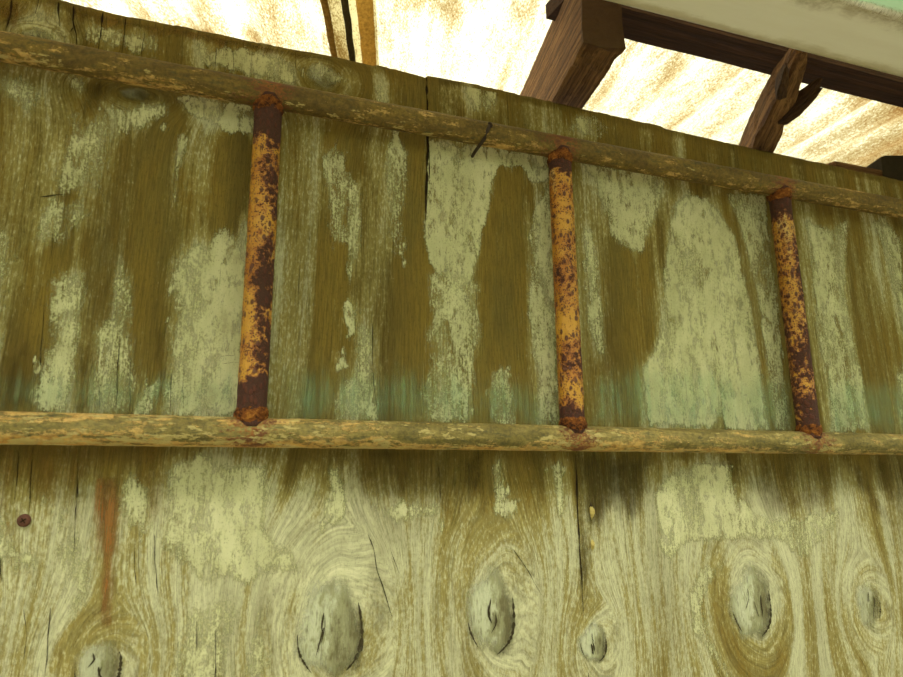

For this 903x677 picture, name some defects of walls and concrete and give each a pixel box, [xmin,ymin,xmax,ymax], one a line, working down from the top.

crack [423,136,431,224]
corrosion [96,480,118,610]